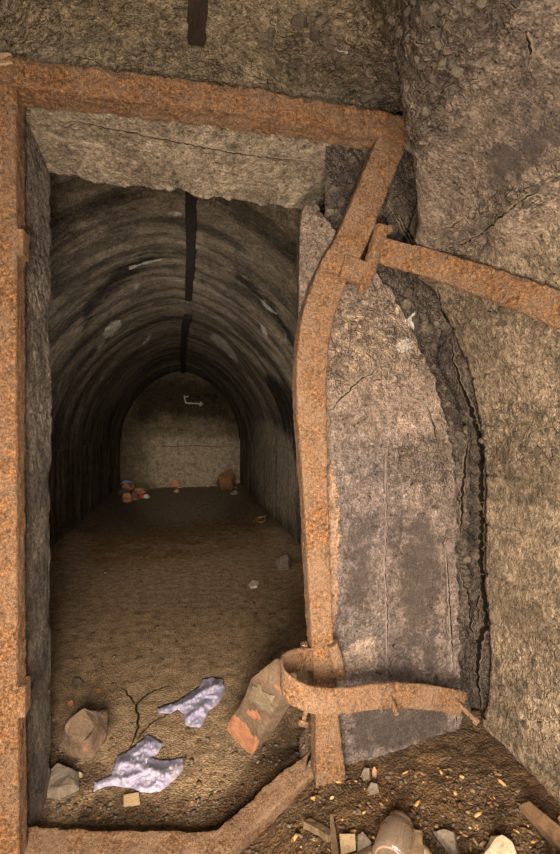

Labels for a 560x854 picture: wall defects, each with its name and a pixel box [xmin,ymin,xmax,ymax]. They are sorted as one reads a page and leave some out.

crack [327,359,392,432]
crack [426,289,489,727]
crack [121,686,172,748]